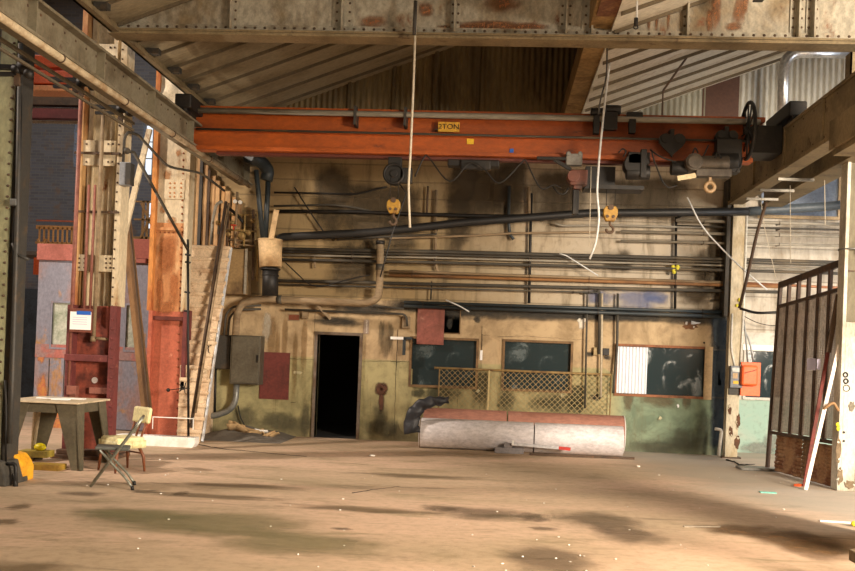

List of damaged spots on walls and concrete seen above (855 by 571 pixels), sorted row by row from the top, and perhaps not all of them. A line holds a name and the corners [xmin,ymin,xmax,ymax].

corrosion [460,21,545,29]
leakage [448,163,583,250]
peeling [728,404,740,449]